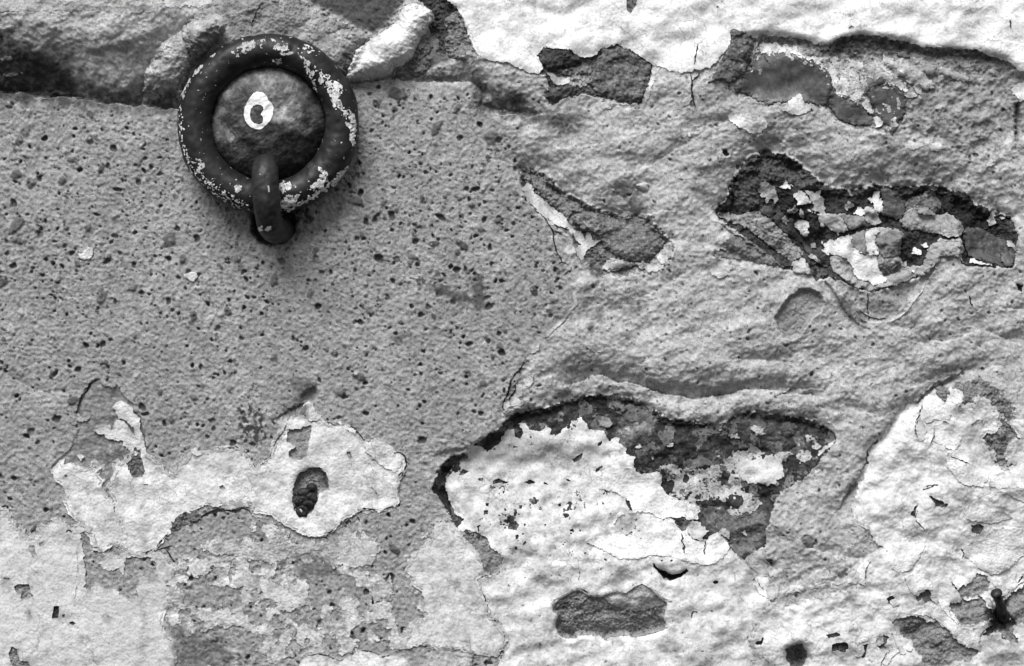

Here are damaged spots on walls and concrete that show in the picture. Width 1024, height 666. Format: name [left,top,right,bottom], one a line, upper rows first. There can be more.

peeling [392,0,1024,135]
spalling [518,166,674,277]
spalling [702,150,1018,322]
crack [502,357,534,410]
peeling [0,379,1024,666]